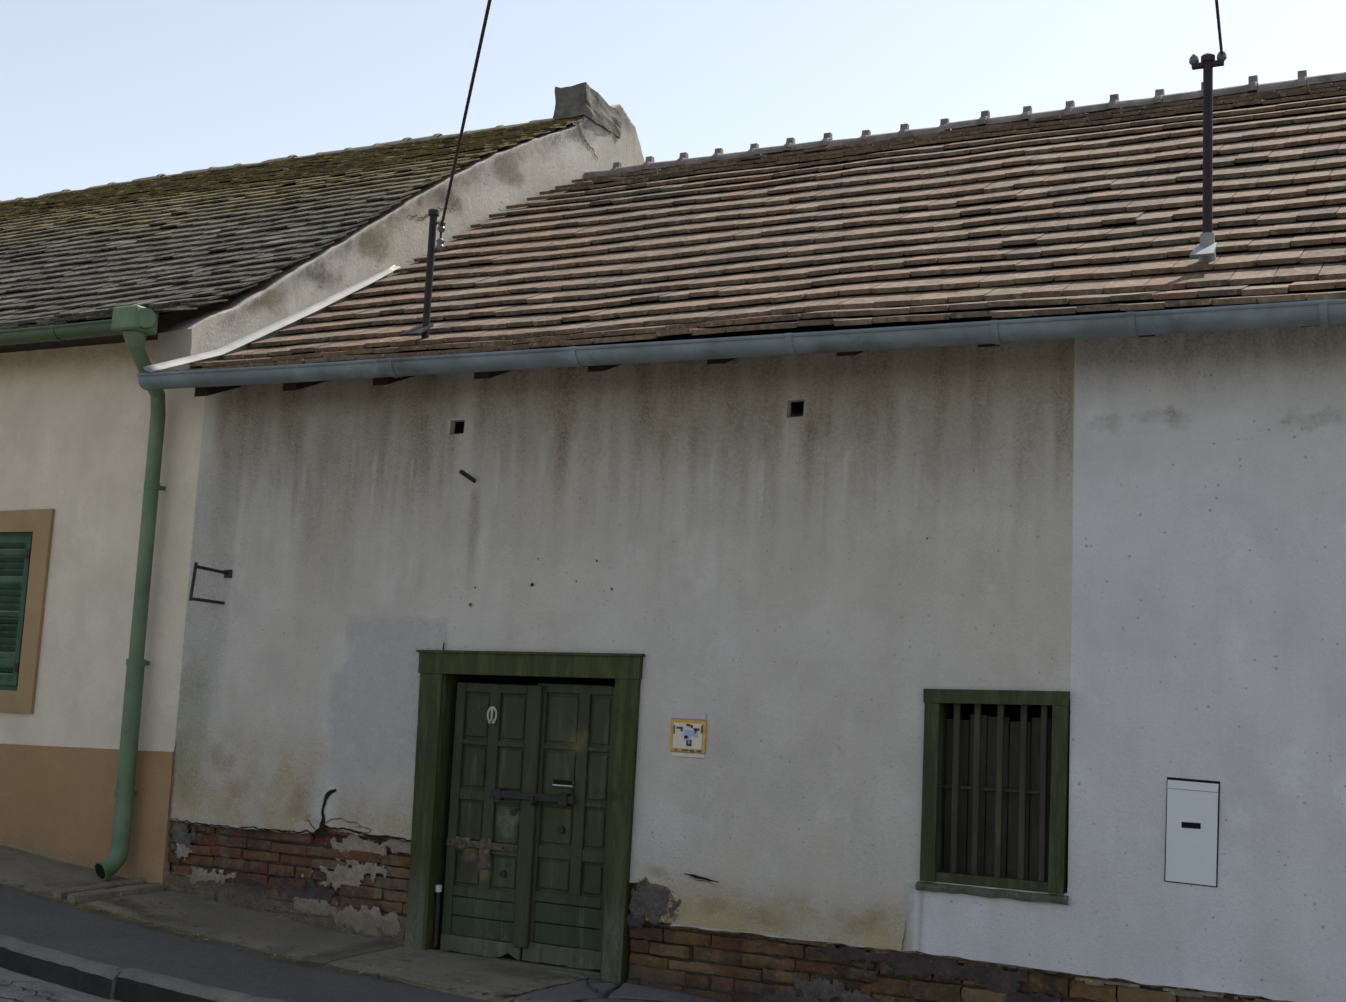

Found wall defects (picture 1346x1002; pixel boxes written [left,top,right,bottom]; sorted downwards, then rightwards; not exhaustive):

crack [407,207,456,219]
crack [169,740,411,841]
spalling [168,821,411,937]
spalling [627,876,1293,1002]